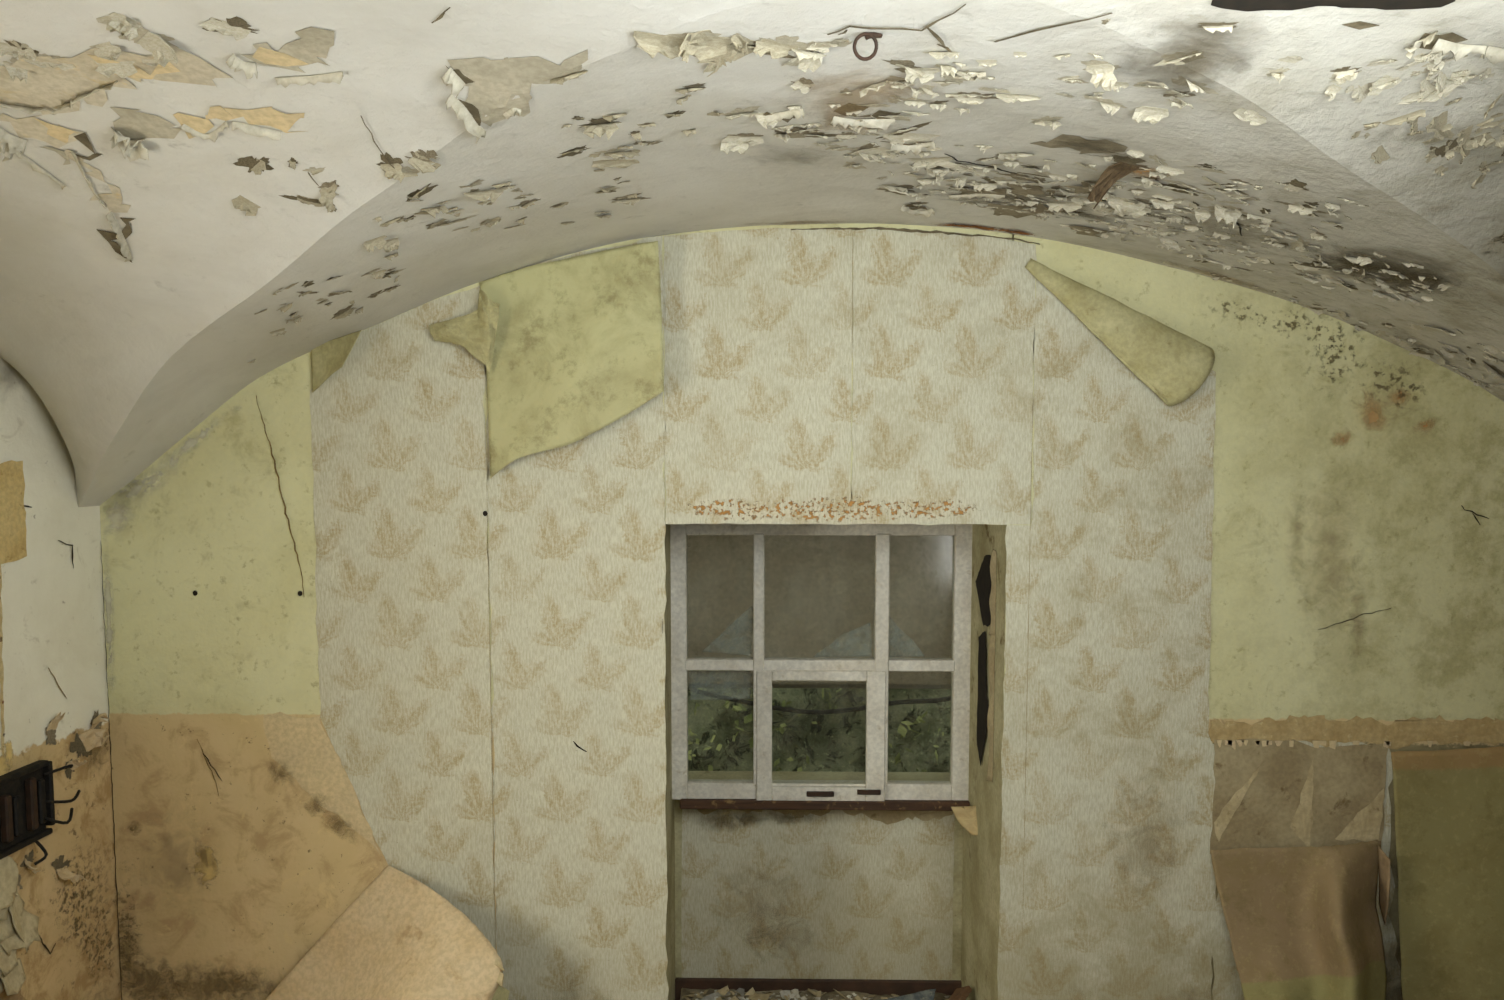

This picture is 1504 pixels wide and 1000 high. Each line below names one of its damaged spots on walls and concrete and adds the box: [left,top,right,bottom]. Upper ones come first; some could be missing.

peeling [0,12,344,262]
peeling [441,49,588,144]
water stain [1165,33,1228,78]
spalling [1198,0,1455,33]
peeling [254,149,574,336]
peeling [557,30,1504,397]
water stain [1342,253,1435,285]
water stain [1278,315,1358,381]
water stain [1374,371,1419,404]
crack [256,395,304,595]
corrosion [688,497,971,522]
water stain [63,863,253,1000]